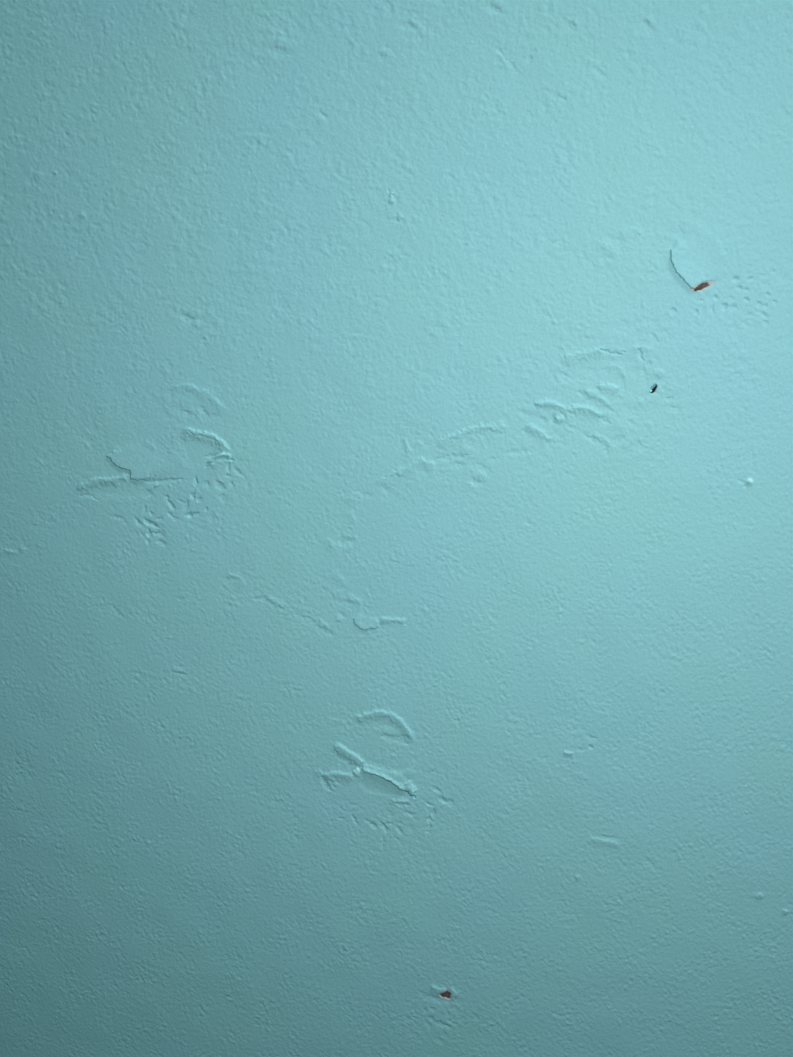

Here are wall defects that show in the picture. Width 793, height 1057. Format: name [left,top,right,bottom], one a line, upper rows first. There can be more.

peeling [666,216,753,296]